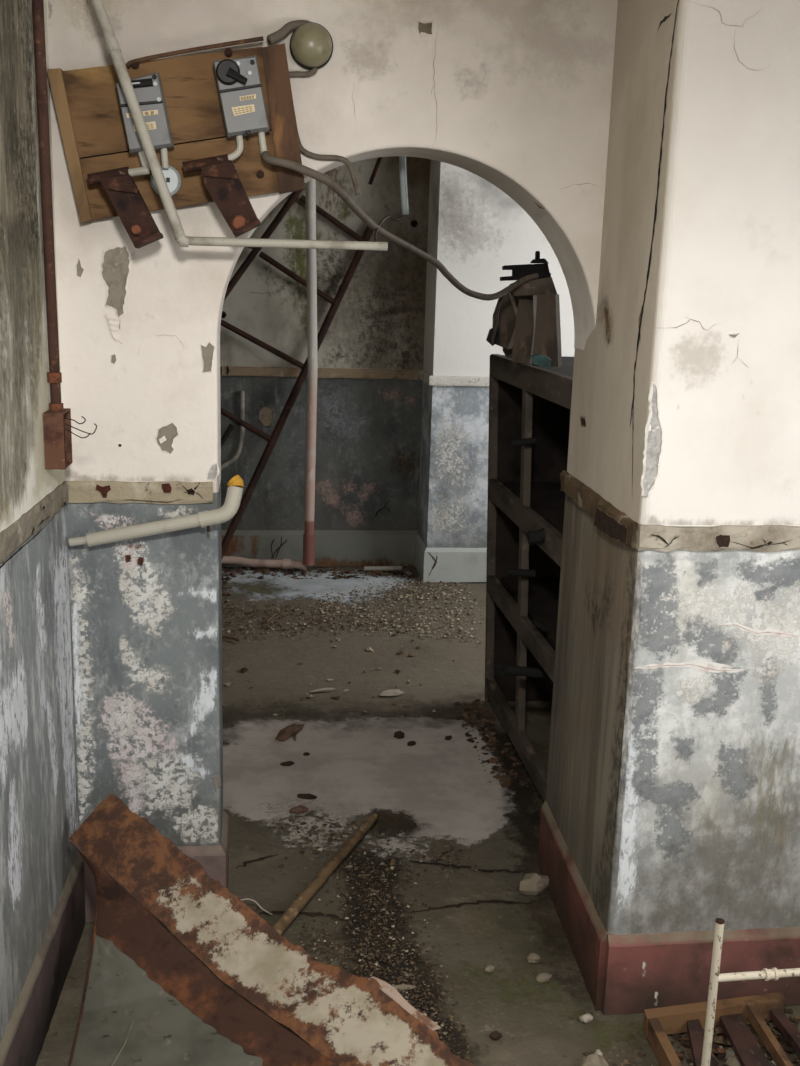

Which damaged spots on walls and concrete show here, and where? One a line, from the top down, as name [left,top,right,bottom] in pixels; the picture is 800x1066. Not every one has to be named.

flaking render [415,20,434,37]
damp [0,0,44,513]
peeling [99,244,138,341]
crack [630,0,765,483]
peeling [200,341,223,376]
peeling [155,422,180,455]
peeling [640,381,663,497]
damp [632,569,800,703]
damp [0,591,28,909]
crack [393,851,522,873]
crack [397,898,540,914]
efflorescence [615,732,644,919]